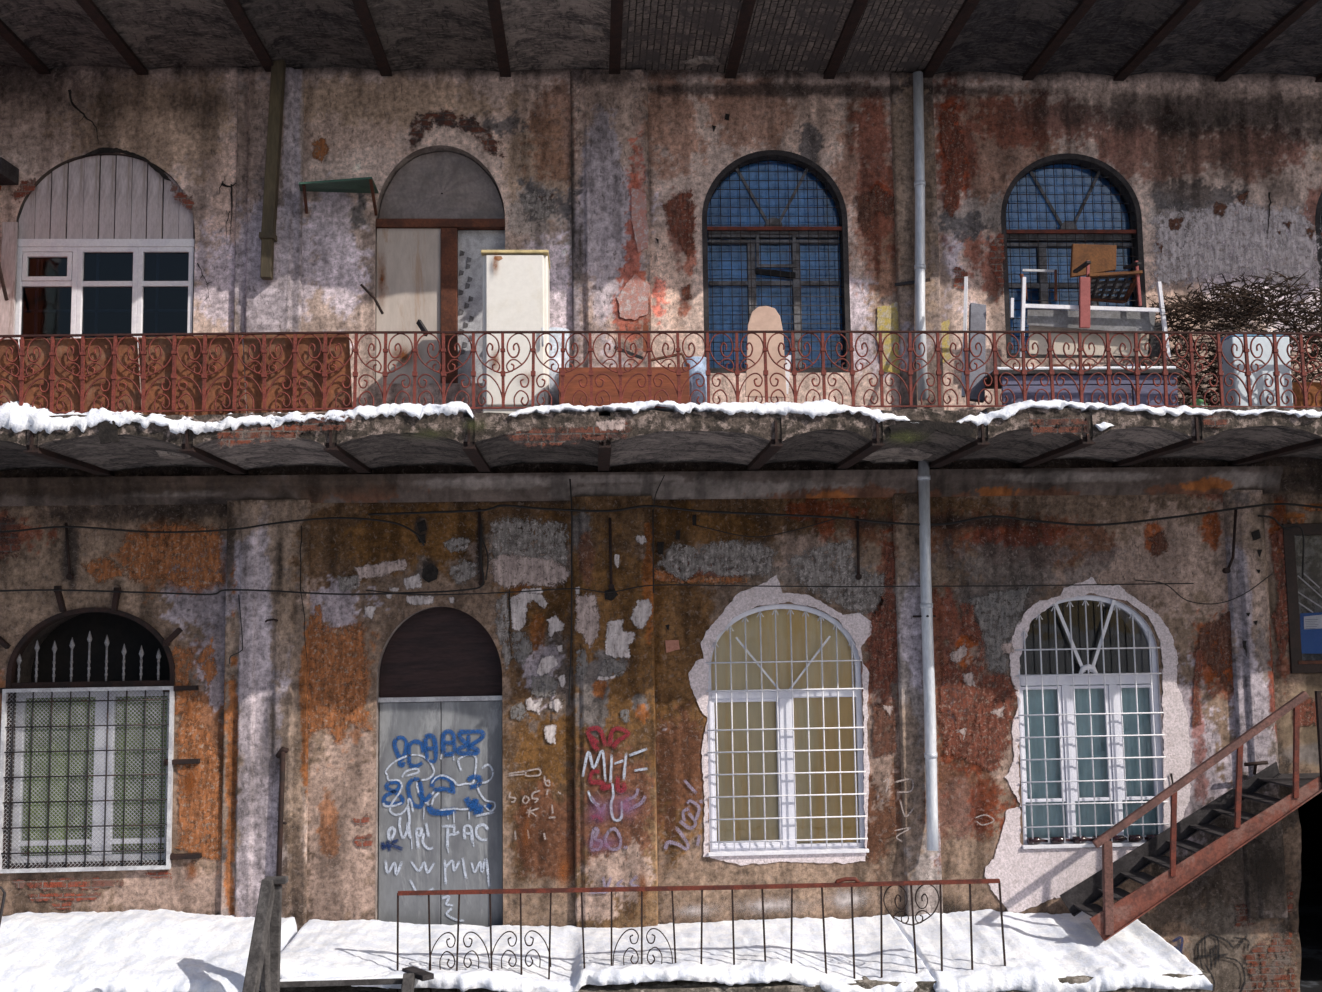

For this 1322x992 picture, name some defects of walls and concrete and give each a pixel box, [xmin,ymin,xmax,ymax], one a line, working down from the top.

flaking render [407,108,504,158]
peeling [81,521,225,591]
peeling [1148,531,1168,557]
peeling [1246,508,1322,662]
peeling [308,515,653,744]
peeling [635,514,898,866]
peeling [937,577,1234,913]
flaking render [353,813,373,848]
flaking render [1232,932,1299,992]